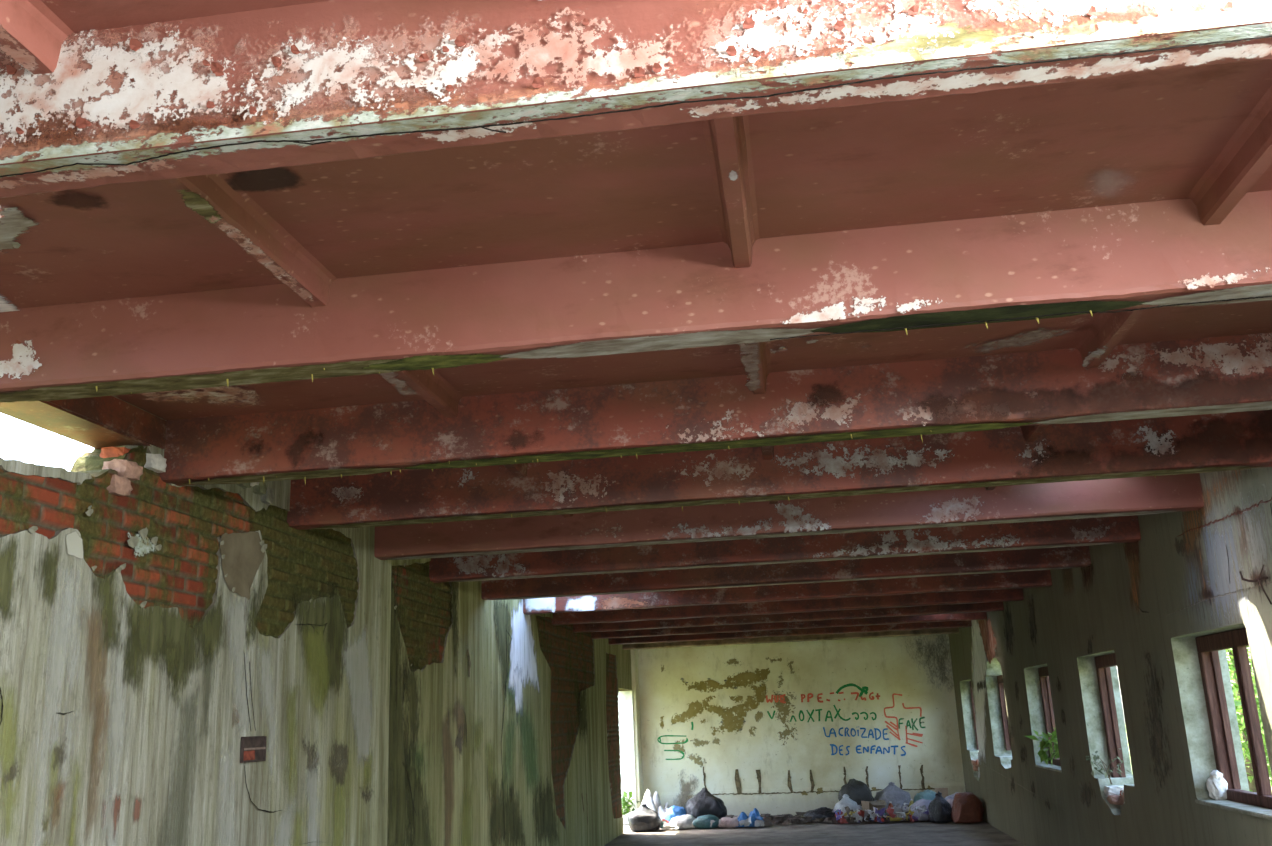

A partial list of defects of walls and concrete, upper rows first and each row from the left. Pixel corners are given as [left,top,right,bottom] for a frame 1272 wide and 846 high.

peeling [0,0,1272,157]
damp [228,168,299,191]
peeling [0,339,42,380]
corrosion [810,385,845,407]
corrosion [922,372,1272,479]
peeling [1082,333,1272,378]
damp [66,531,83,559]
damp [127,527,162,558]
spalling [0,445,359,641]
damp [35,570,141,846]
damp [227,599,372,846]
peeling [659,657,794,767]